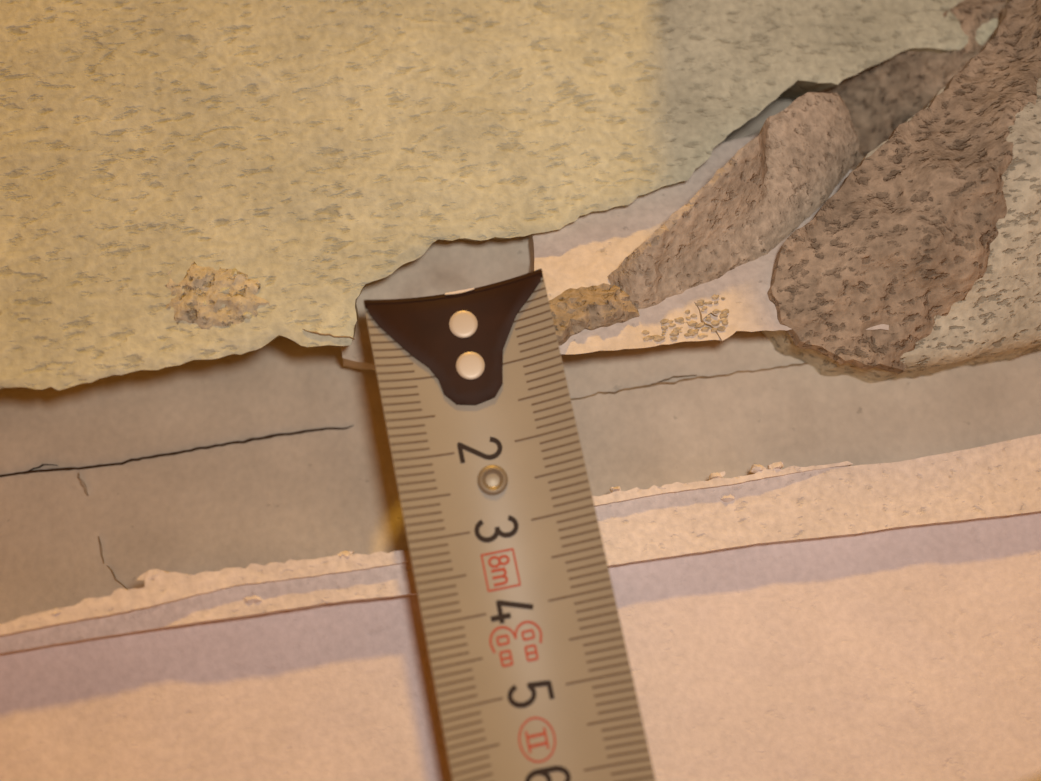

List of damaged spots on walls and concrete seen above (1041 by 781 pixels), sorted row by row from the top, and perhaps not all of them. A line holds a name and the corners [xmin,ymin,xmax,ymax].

spalling [817,0,1007,171]
crack [0,425,353,496]
crack [98,536,128,590]